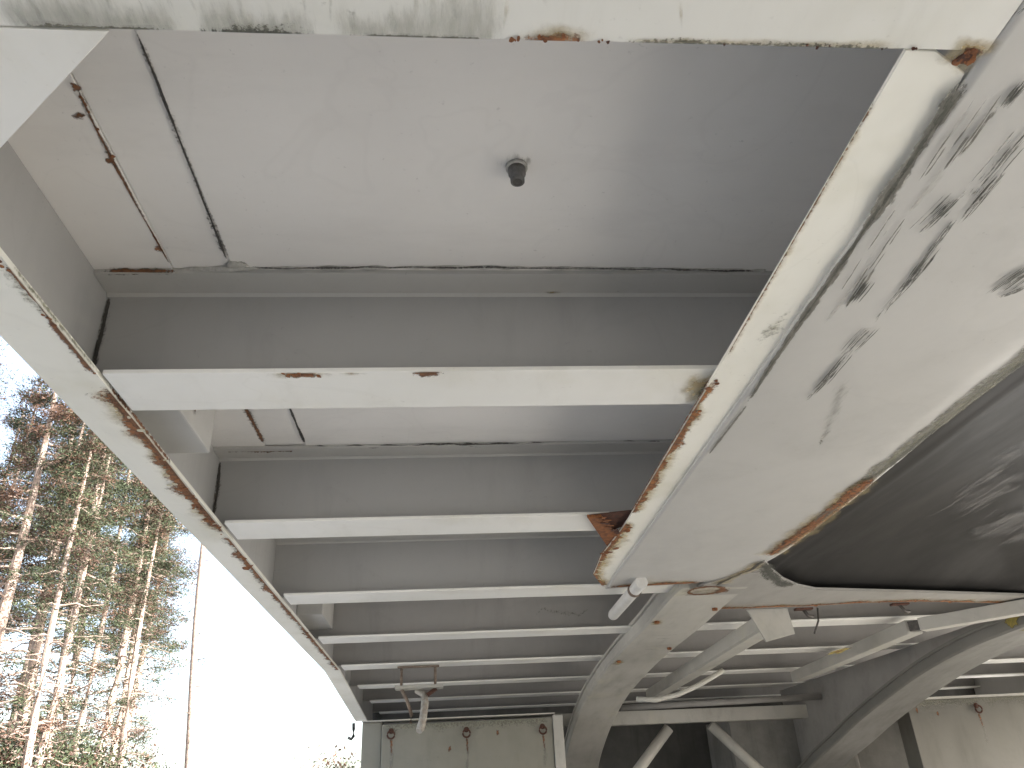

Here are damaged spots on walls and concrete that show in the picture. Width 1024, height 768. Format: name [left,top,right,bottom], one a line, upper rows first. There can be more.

leakage [201,23,308,34]
rust [509,31,580,43]
rust [633,38,888,50]
rust [951,44,986,66]
leakage [710,83,1024,453]
rust [96,387,338,670]
rust [593,380,720,587]
rust [766,479,874,555]